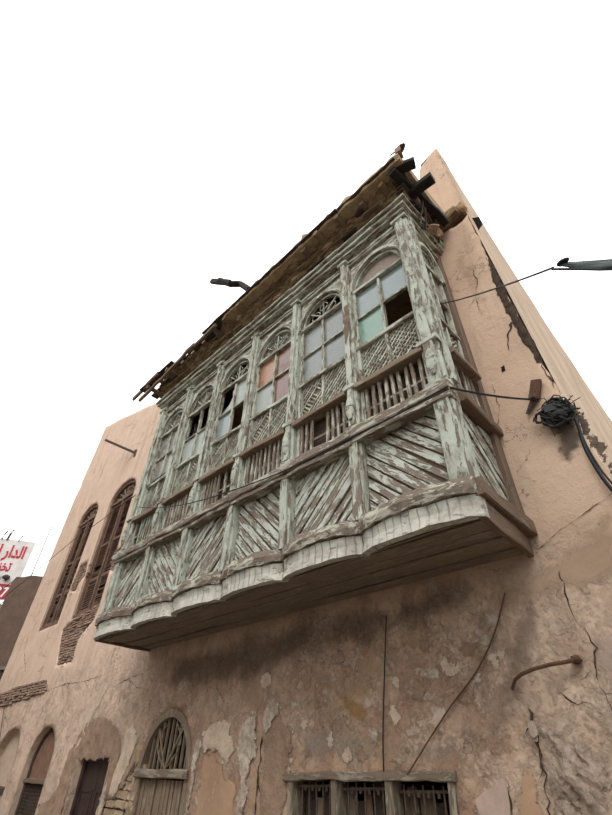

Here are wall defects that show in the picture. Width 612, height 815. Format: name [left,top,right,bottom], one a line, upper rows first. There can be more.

crack [470,259,554,387]
crack [556,564,612,715]
flaking render [37,717,148,815]
flaking render [185,697,281,815]
crack [524,708,551,815]